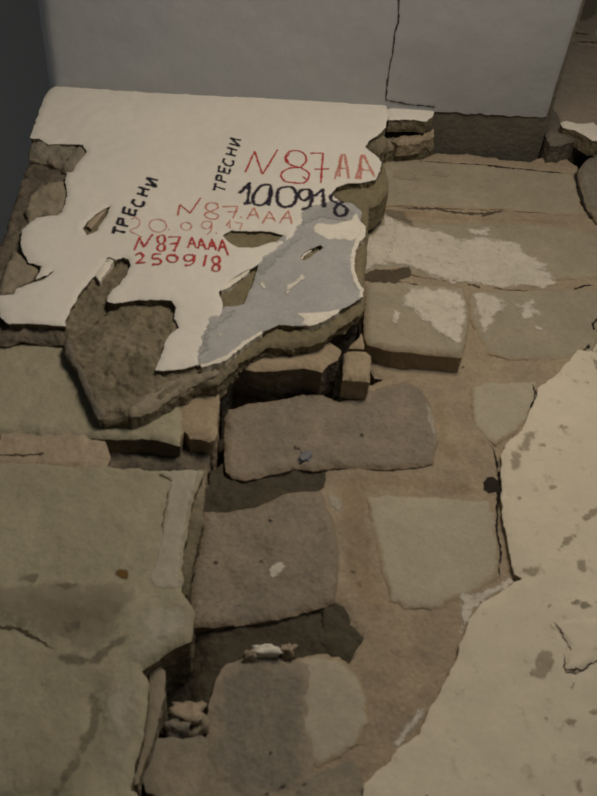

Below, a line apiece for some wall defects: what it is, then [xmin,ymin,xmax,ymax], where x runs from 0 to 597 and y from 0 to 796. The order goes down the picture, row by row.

crack [385,0,435,108]
peeling [0,129,435,430]
crack [0,434,44,457]
hole [483,477,499,493]
crack [492,448,502,577]
crack [0,625,55,649]
crack [554,622,597,671]